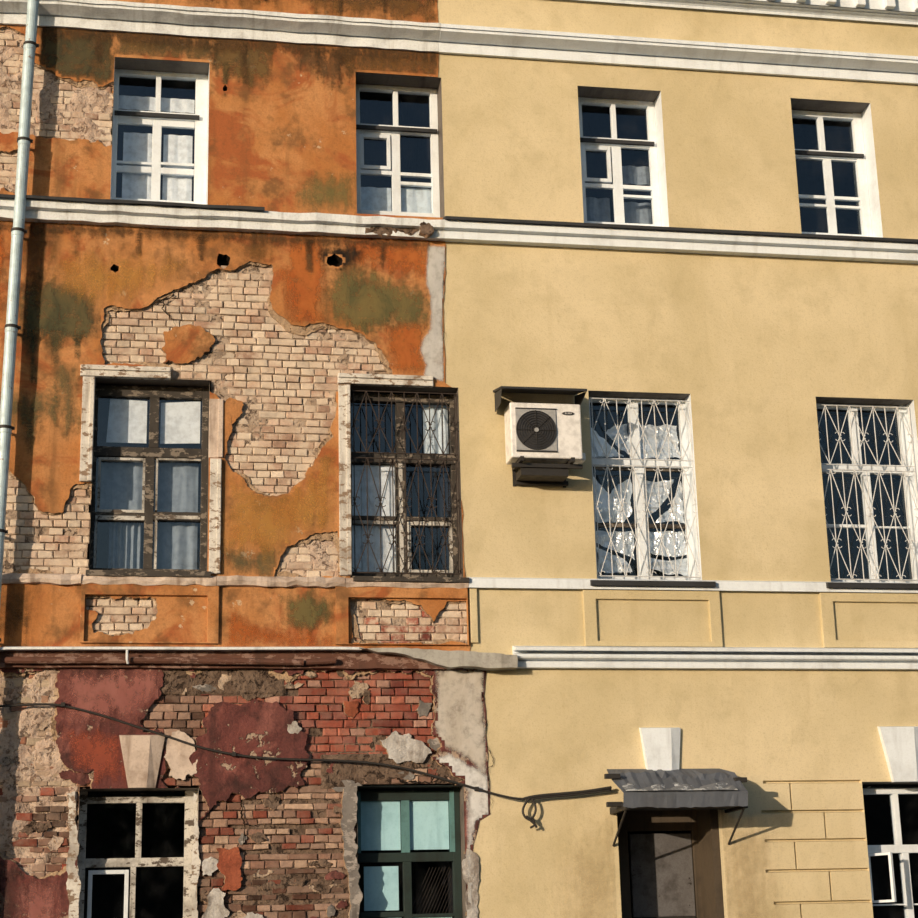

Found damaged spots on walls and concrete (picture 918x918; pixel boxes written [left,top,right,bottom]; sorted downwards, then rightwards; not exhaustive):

flaking render [0,26,25,193]
flaking render [30,63,114,147]
leakage [11,335,80,449]
flaking render [100,221,445,496]
flaking render [2,470,92,576]
flaking render [274,531,340,577]
flaking render [85,595,158,636]
flaking render [350,598,469,644]
flaking render [0,668,488,918]